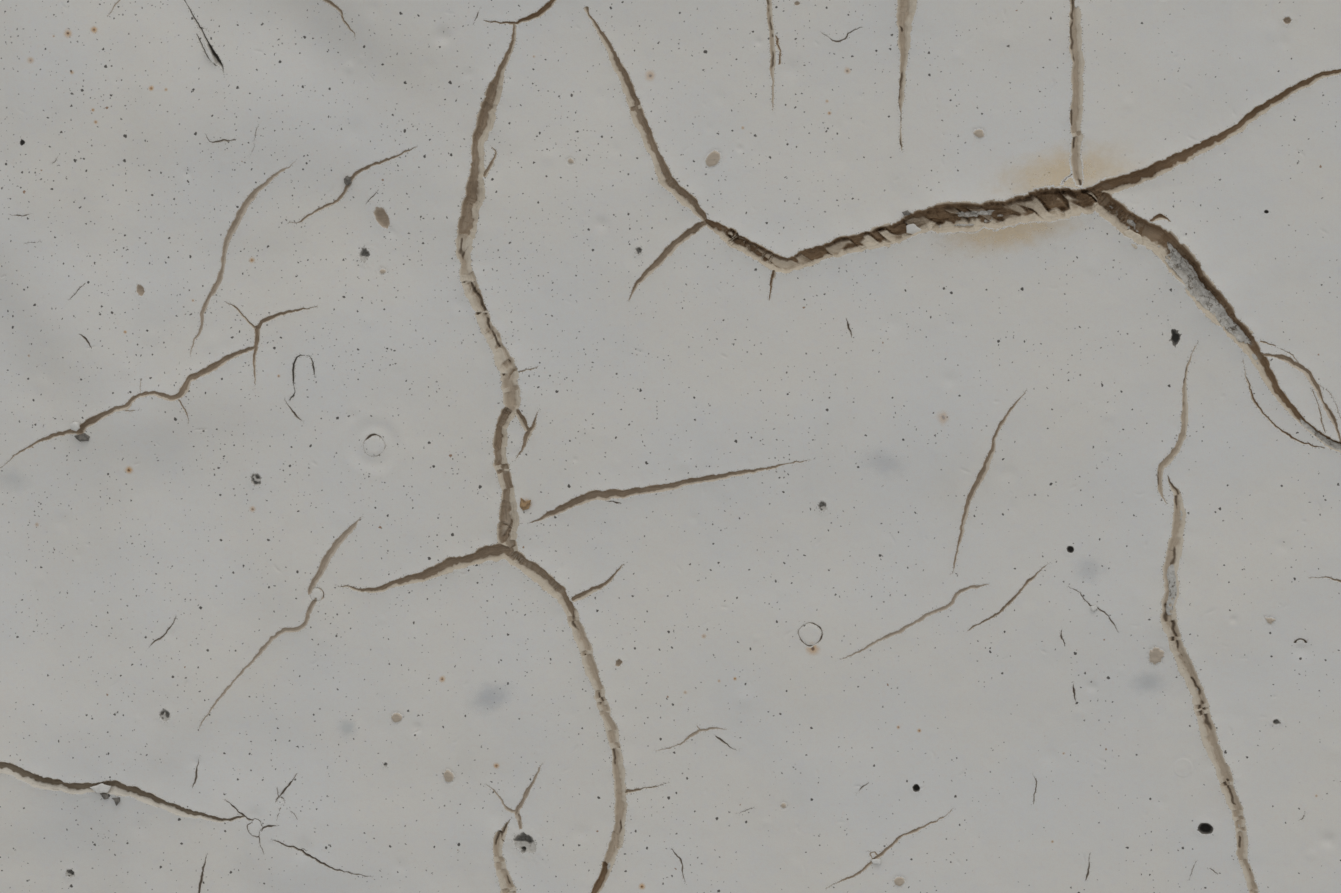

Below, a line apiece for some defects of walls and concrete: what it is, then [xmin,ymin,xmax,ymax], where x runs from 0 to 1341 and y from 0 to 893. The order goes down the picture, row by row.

crack [0,0,818,893]
crack [581,0,1341,893]